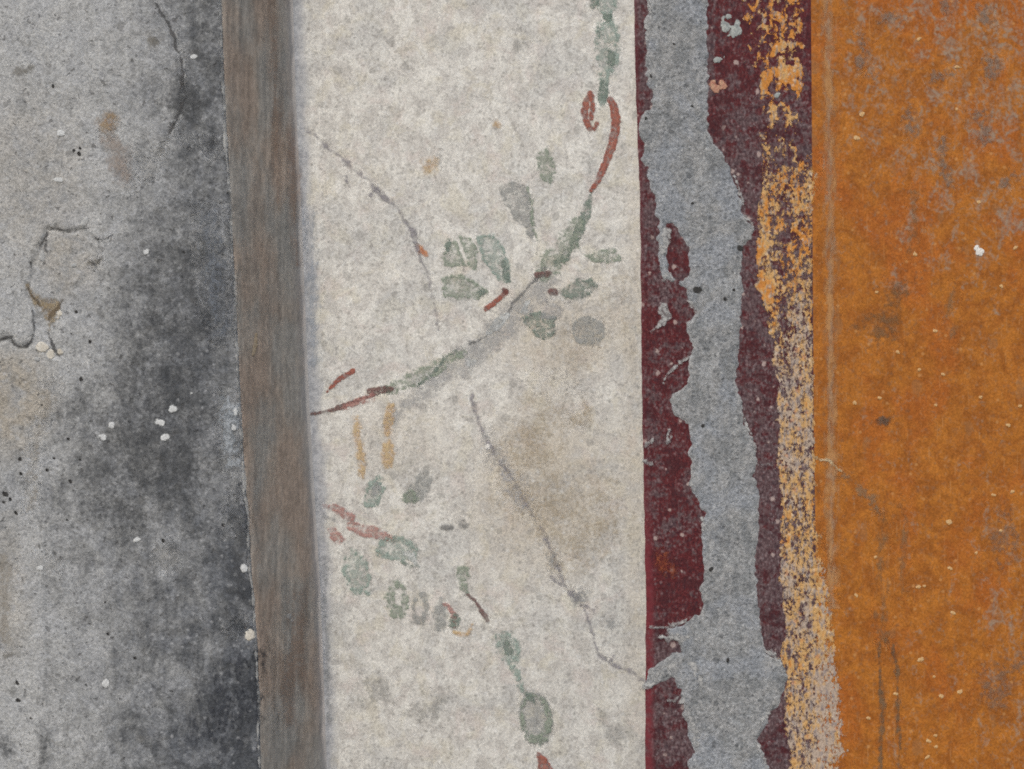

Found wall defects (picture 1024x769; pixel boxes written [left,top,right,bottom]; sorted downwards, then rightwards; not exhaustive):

crack [155,3,186,157]
crack [30,227,113,264]
crack [323,143,431,285]
crack [0,310,60,356]
efflorescence [219,397,240,467]
spalling [639,0,849,769]
crack [470,394,642,680]
damp [189,652,265,758]